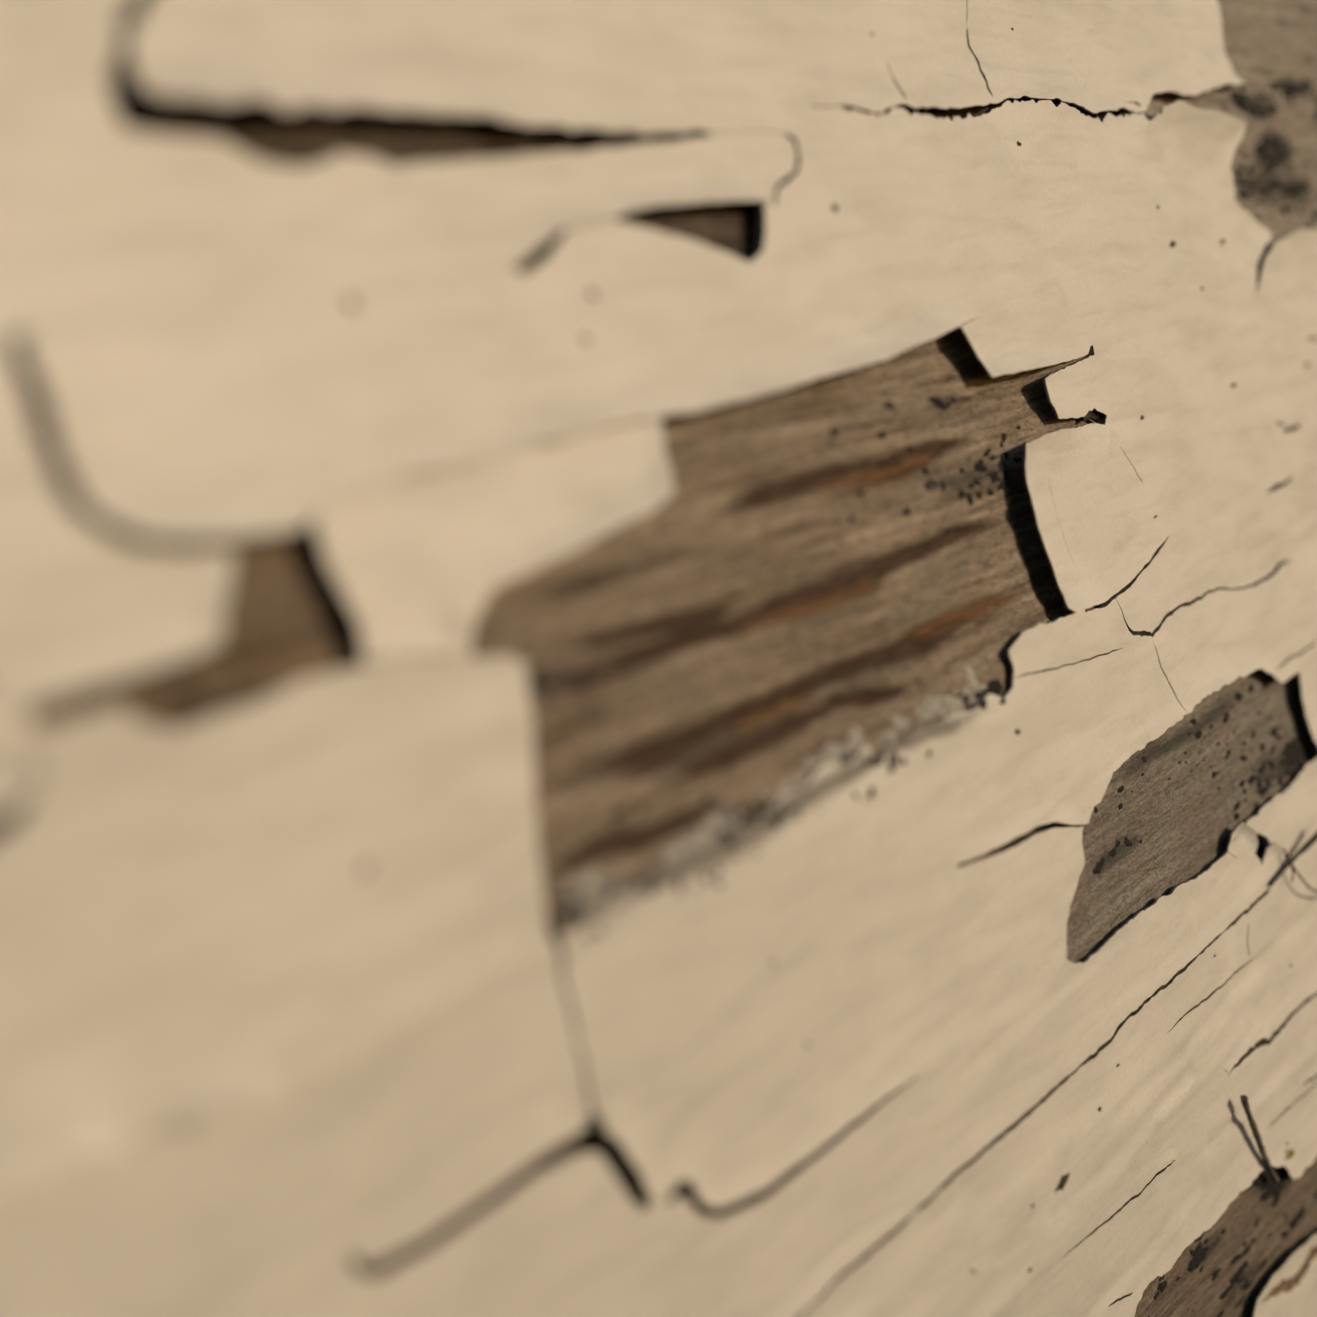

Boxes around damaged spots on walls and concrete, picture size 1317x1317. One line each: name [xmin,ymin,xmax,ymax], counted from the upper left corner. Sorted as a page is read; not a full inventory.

peeling [127,0,1317,313]
peeling [0,136,1171,1206]
crack [1011,560,1291,702]
peeling [342,669,1317,1317]
crack [799,886,1271,1317]
crack [1228,993,1317,1076]